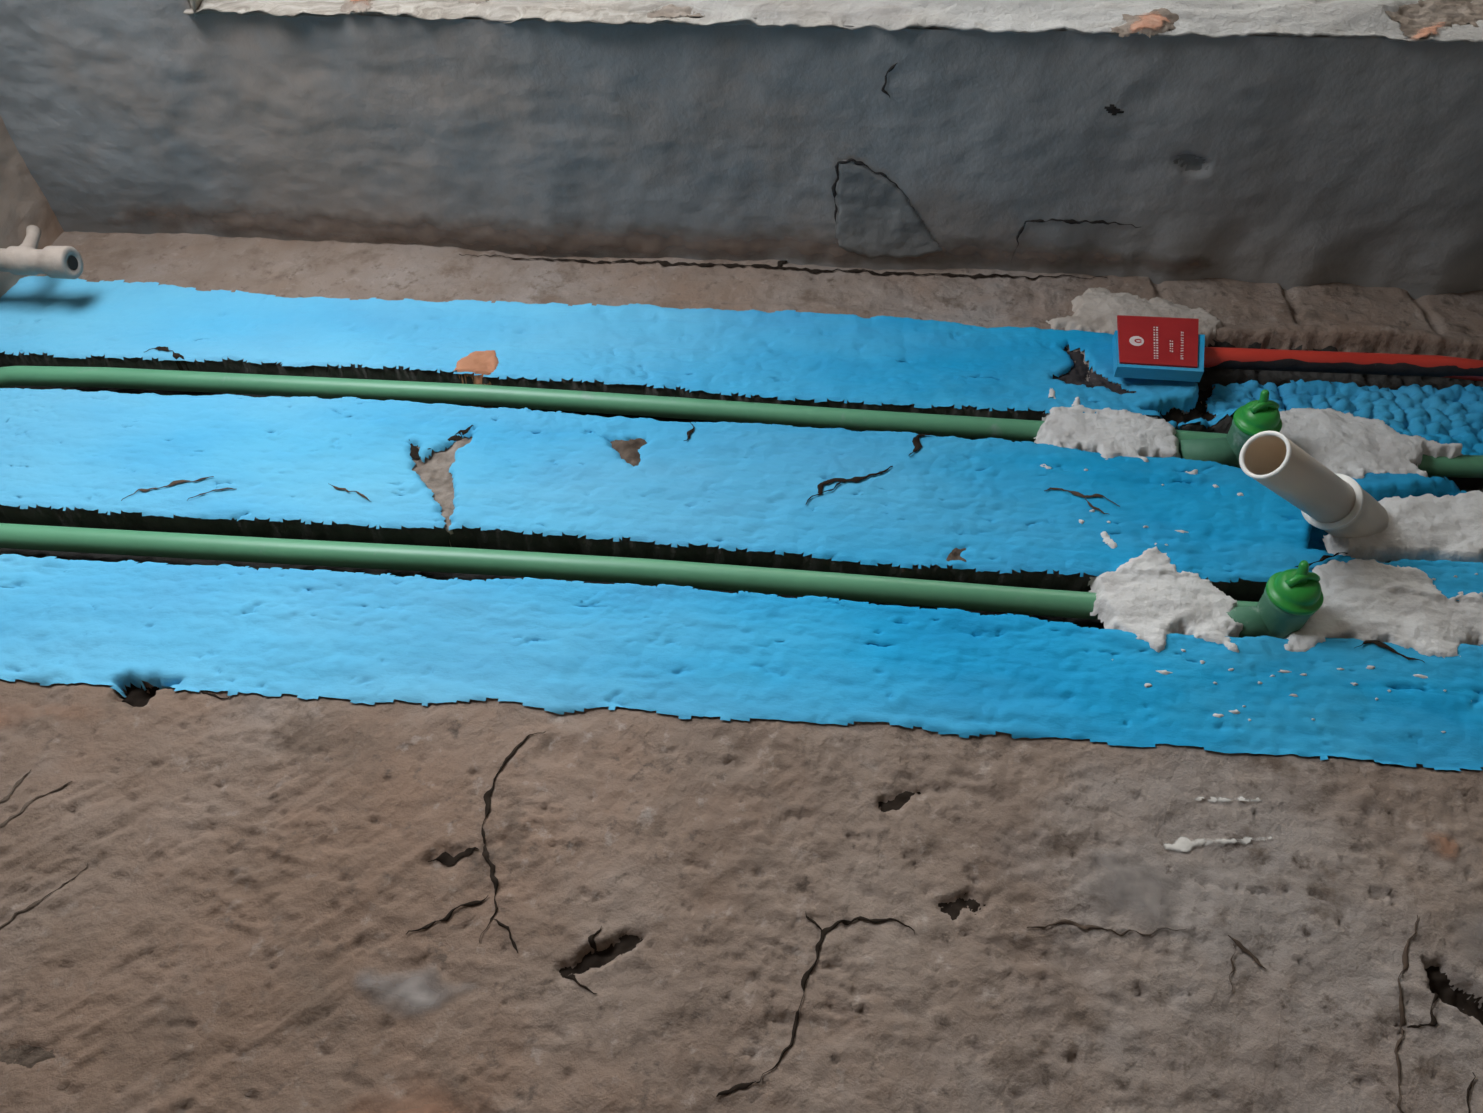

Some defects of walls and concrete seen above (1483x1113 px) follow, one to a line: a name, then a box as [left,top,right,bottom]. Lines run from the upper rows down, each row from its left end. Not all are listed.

spalling [1385,0,1483,41]
crack [406,731,546,953]
crack [716,911,915,1097]
crack [1394,915,1483,1113]